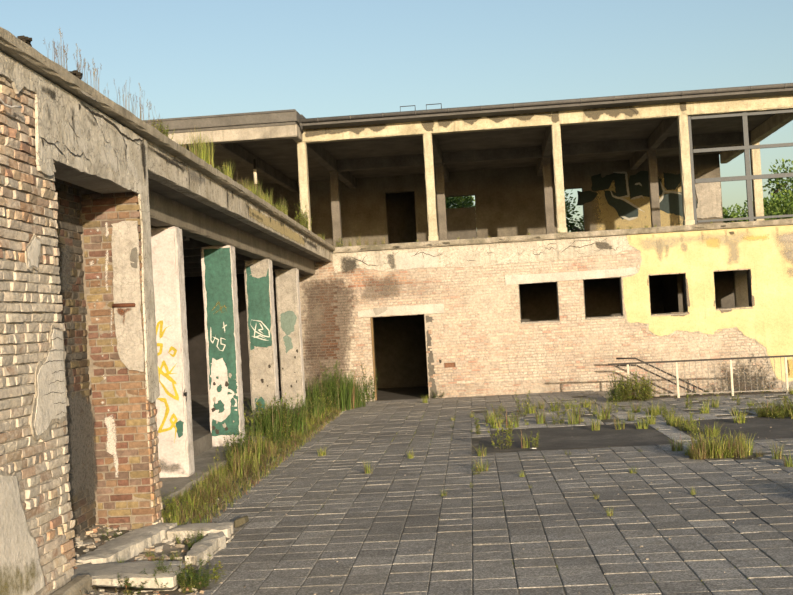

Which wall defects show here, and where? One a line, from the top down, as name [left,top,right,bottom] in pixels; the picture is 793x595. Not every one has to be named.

crack [41,104,190,186]
leakage [644,232,744,263]
peeling [204,247,239,436]
peeling [246,266,298,387]